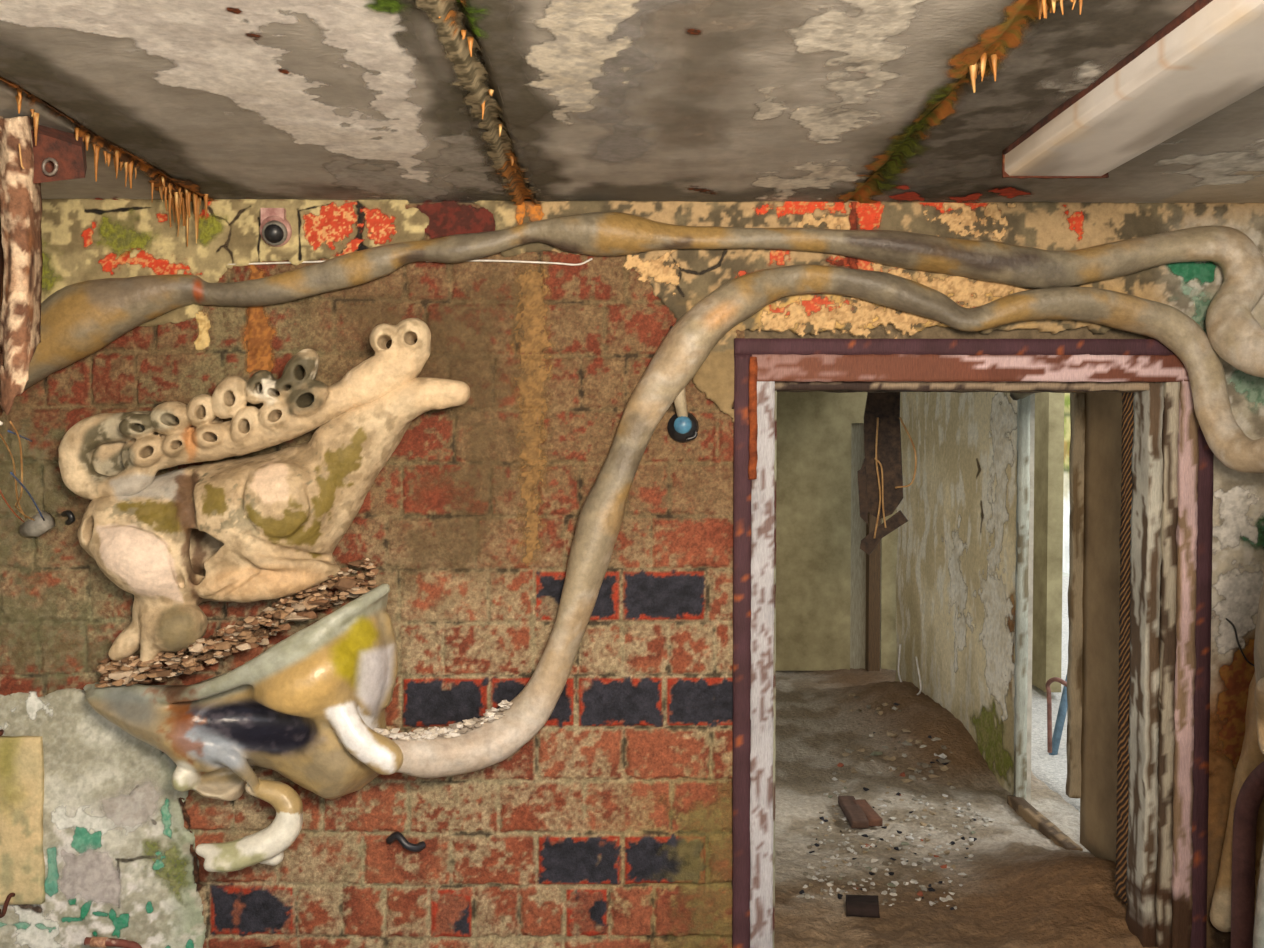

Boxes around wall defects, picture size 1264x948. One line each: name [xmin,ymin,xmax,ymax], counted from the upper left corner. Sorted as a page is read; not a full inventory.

crack [207,206,261,263]
peeling [0,0,508,283]
damp [392,0,515,201]
damp [462,0,838,202]
spalling [0,249,680,740]
spalling [161,378,734,948]
peeling [942,392,1017,721]
corrosion [1209,638,1255,769]
peeling [1212,486,1263,654]
peeling [0,847,130,948]
peeling [51,806,141,854]